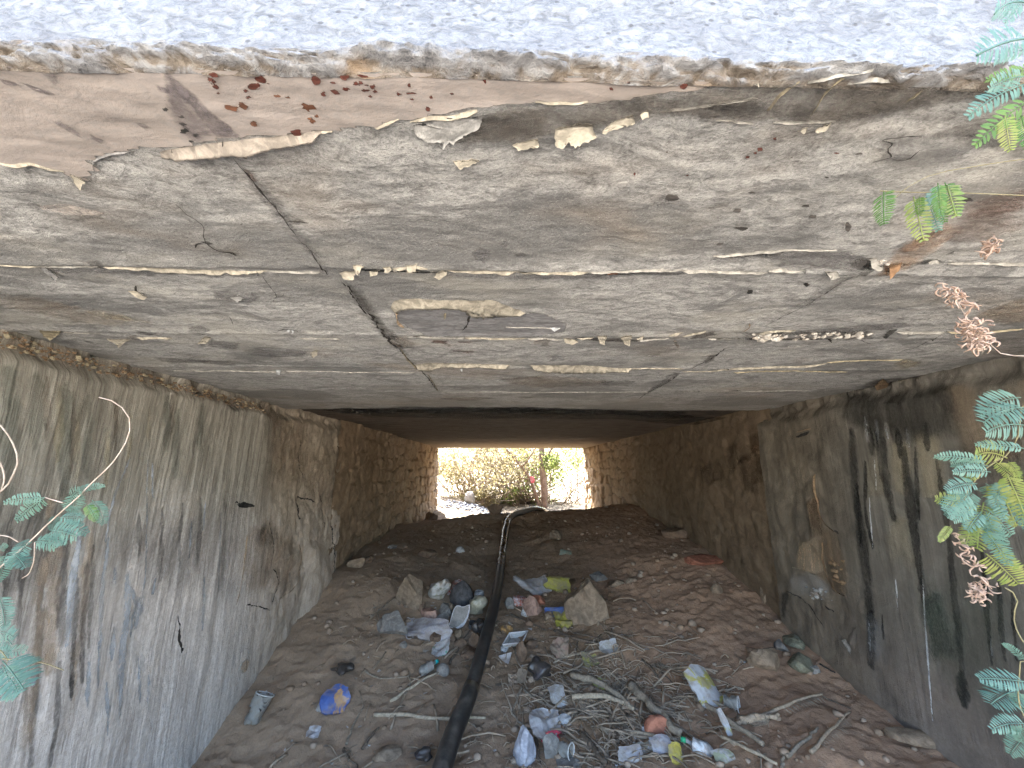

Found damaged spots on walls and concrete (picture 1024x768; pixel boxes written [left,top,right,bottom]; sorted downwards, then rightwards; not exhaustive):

corrosion [208,72,290,127]
corrosion [290,74,377,136]
peeling [0,38,1024,191]
crack [176,205,235,256]
crack [232,157,438,391]
peeling [340,249,904,280]
peeling [929,259,1024,267]
peeling [390,299,962,346]
water stain [846,390,970,721]
water stain [49,461,156,767]
crack [177,618,185,653]
water stain [981,545,1017,665]